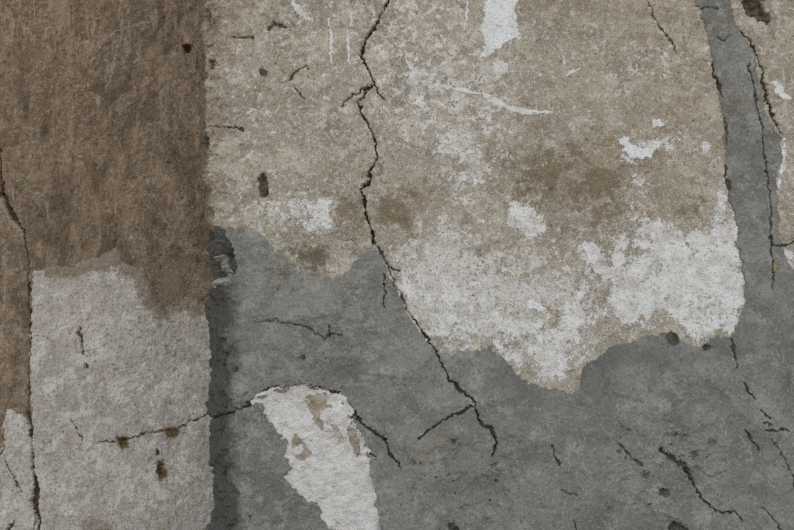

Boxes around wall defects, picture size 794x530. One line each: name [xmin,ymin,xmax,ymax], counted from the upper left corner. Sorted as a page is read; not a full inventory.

crack [648,1,677,54]
crack [711,63,723,97]
crack [0,149,26,239]
crack [342,0,413,317]
crack [723,166,731,190]
crack [747,64,793,286]
crack [0,261,42,530]
crack [71,386,289,443]
spalling [251,384,381,530]
crack [312,386,401,468]
crack [418,352,498,456]
crack [730,339,794,486]